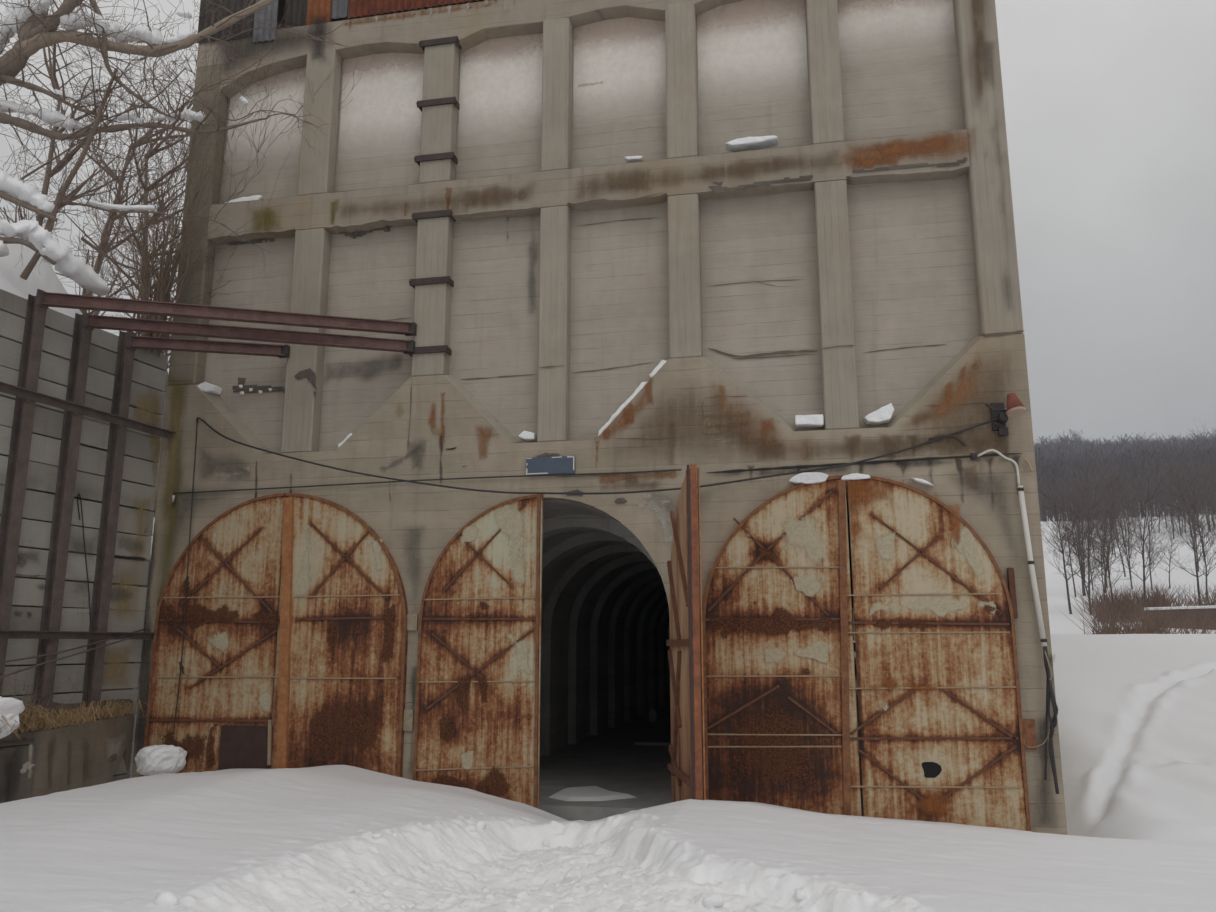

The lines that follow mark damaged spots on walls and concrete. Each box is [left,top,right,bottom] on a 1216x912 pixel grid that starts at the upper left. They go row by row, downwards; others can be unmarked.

rust [845,136,968,167]
rust [596,381,652,461]
rust [157,577,280,632]
rust [380,604,396,662]
rust [709,602,839,640]
rust [876,617,930,630]
rust [158,724,218,769]
rust [303,689,395,766]
rust [439,674,488,742]
rust [719,693,817,798]
rust [431,766,526,797]